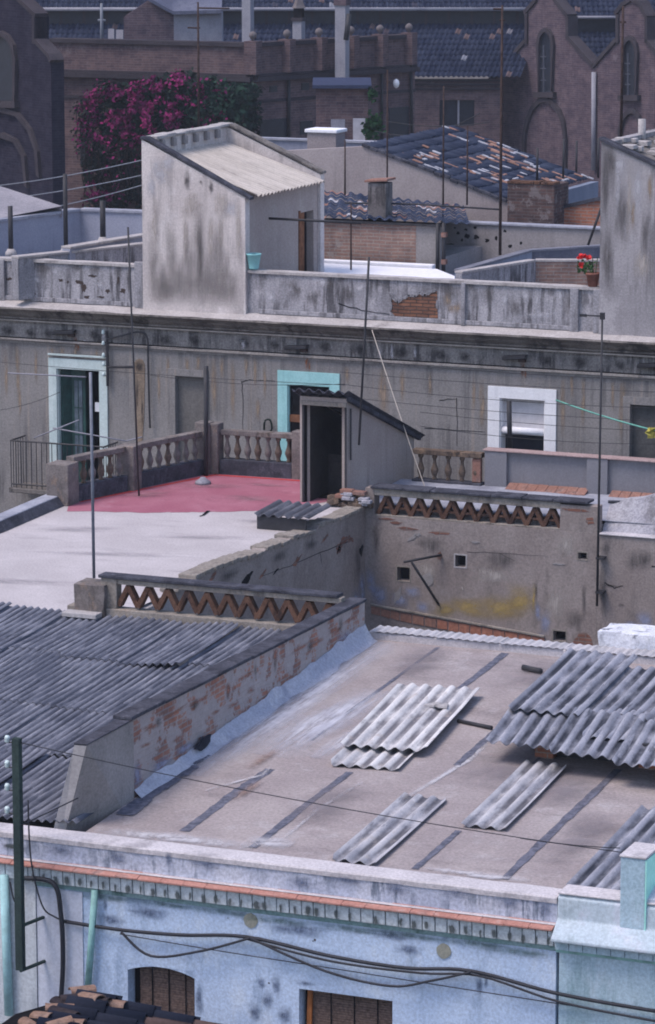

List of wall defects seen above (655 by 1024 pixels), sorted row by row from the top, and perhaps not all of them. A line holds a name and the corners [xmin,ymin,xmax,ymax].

spalling [388,289,439,319]